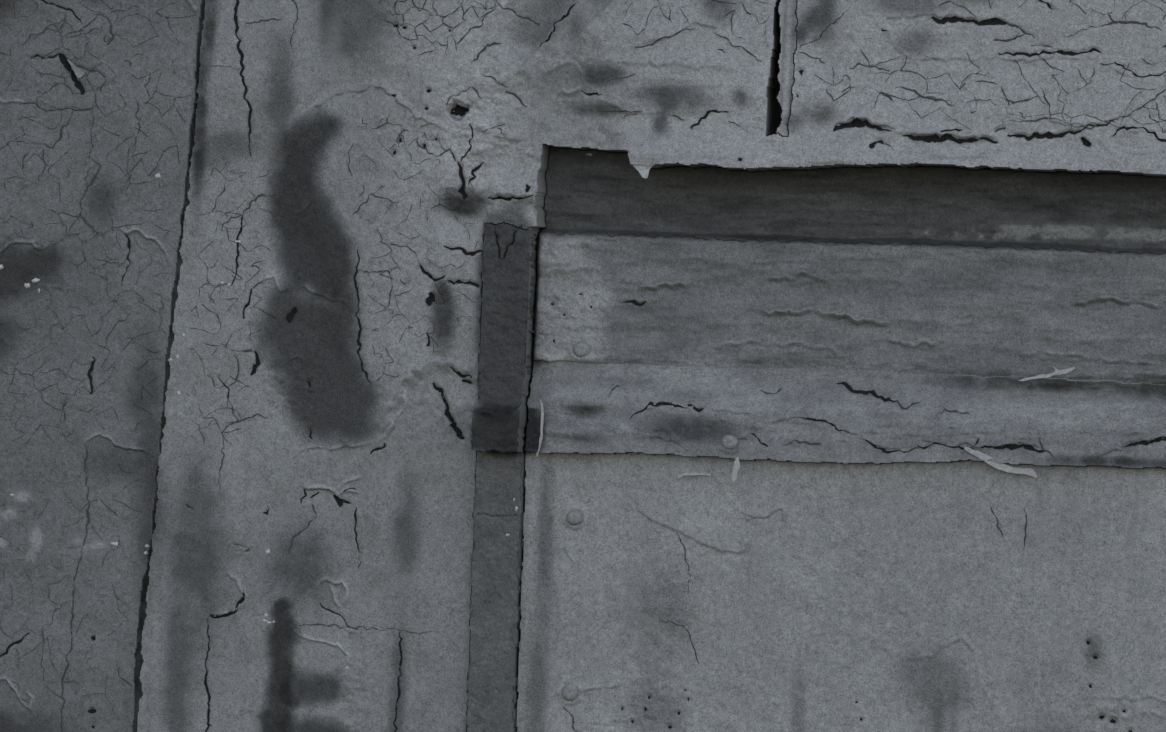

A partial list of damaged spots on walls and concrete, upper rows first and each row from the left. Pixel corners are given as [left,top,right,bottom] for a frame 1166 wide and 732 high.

crack [211,0,298,156]
crack [798,0,1166,142]
crack [347,0,575,383]
peeling [628,152,656,178]
damp [266,118,373,434]
crack [433,366,472,439]
peeling [536,399,544,456]
crack [629,402,704,419]
crack [738,382,1054,457]
peeling [917,425,1047,478]
peeling [1018,366,1075,381]
peeling [1083,417,1166,456]